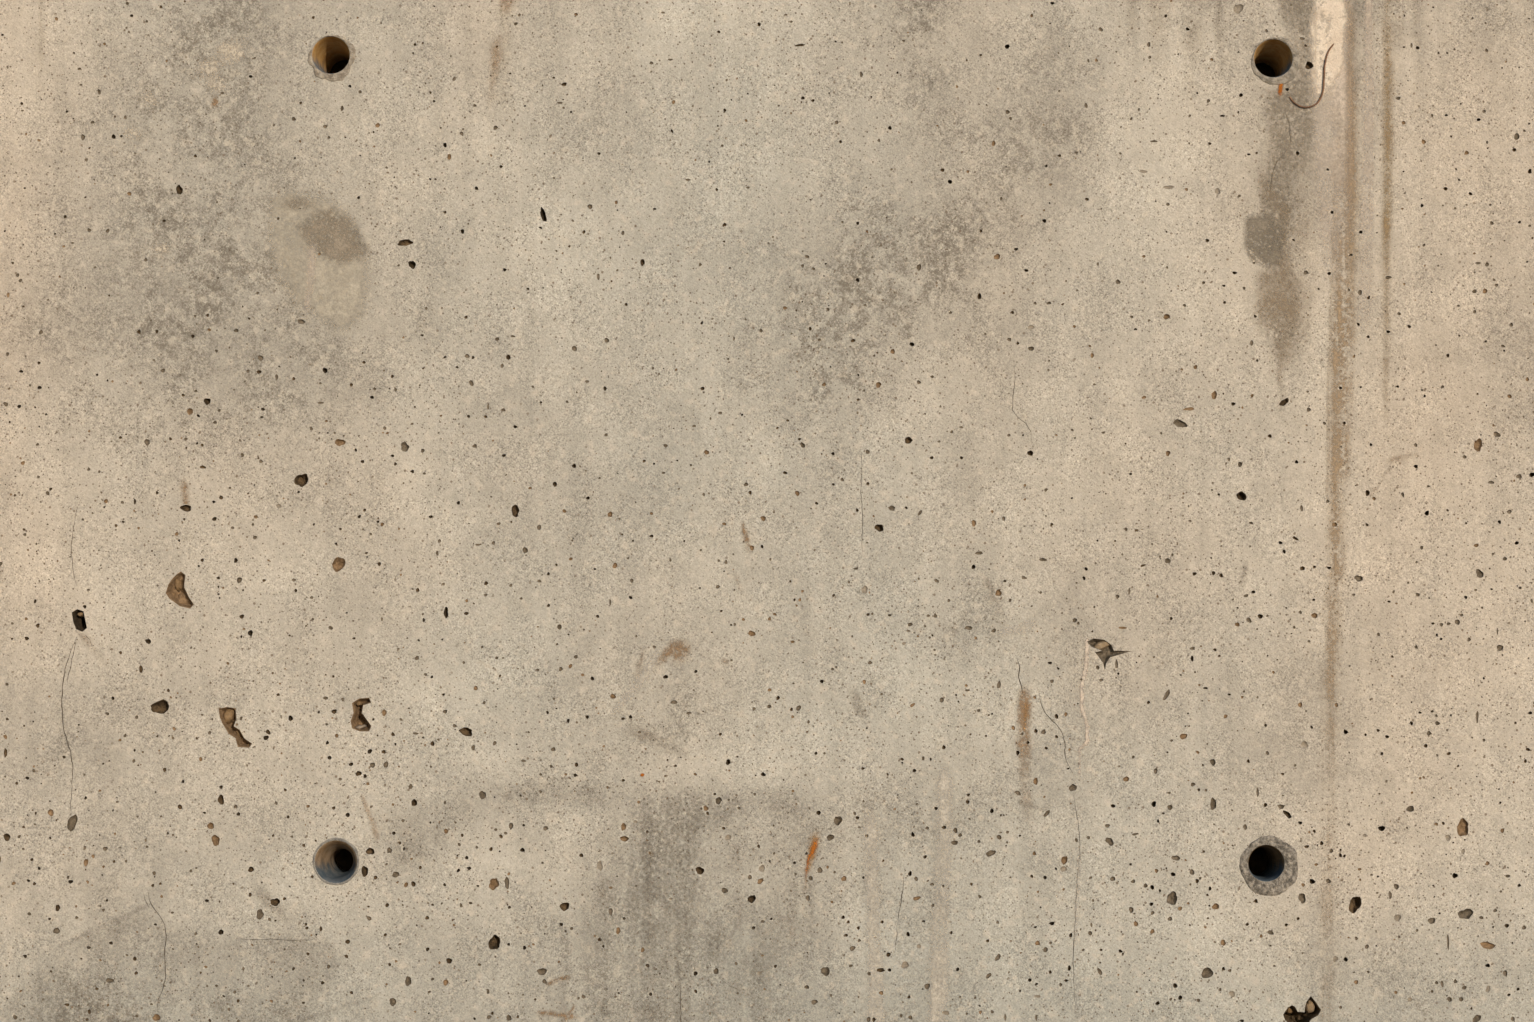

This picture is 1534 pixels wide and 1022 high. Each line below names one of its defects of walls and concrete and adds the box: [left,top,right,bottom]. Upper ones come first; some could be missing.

water stain [1245,0,1392,698]
rust [1018,691,1031,757]
rust [807,837,817,869]